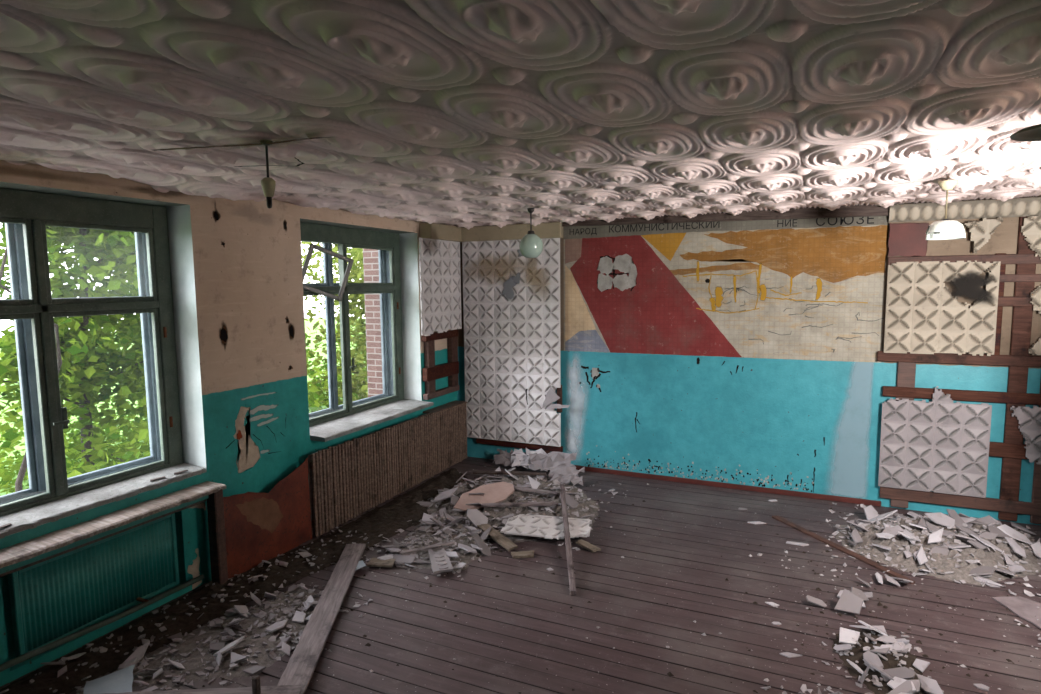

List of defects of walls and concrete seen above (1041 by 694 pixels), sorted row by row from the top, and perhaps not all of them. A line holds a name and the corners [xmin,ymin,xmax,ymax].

peeling [579,366,610,392]
peeling [233,405,261,473]
peeling [586,445,814,492]